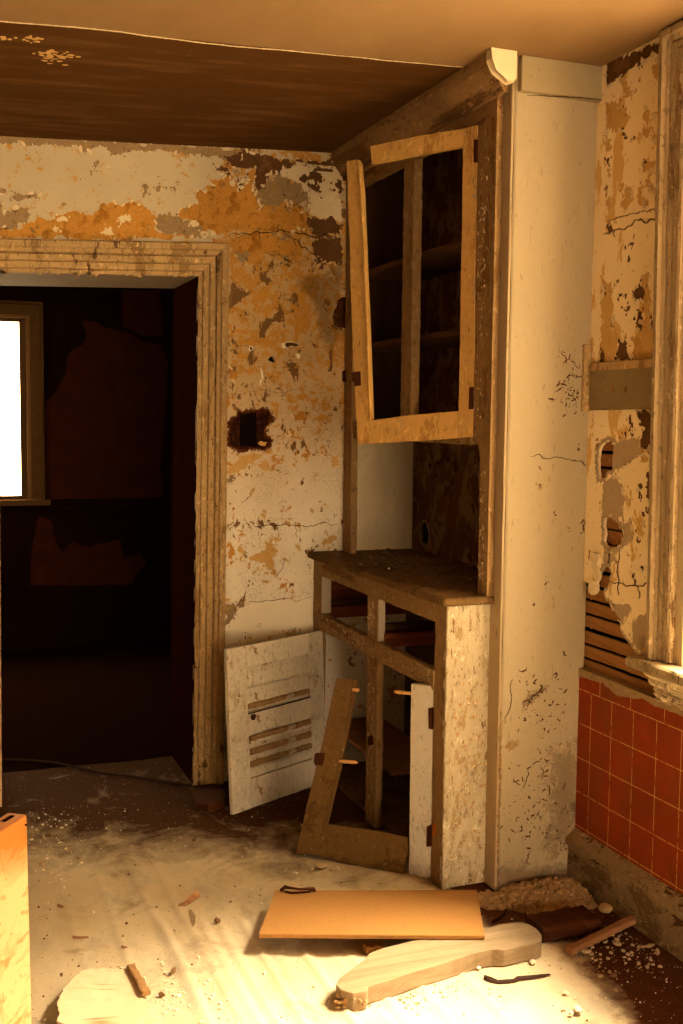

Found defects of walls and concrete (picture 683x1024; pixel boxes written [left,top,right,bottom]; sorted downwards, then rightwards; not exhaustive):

peeling [0,136,346,278]